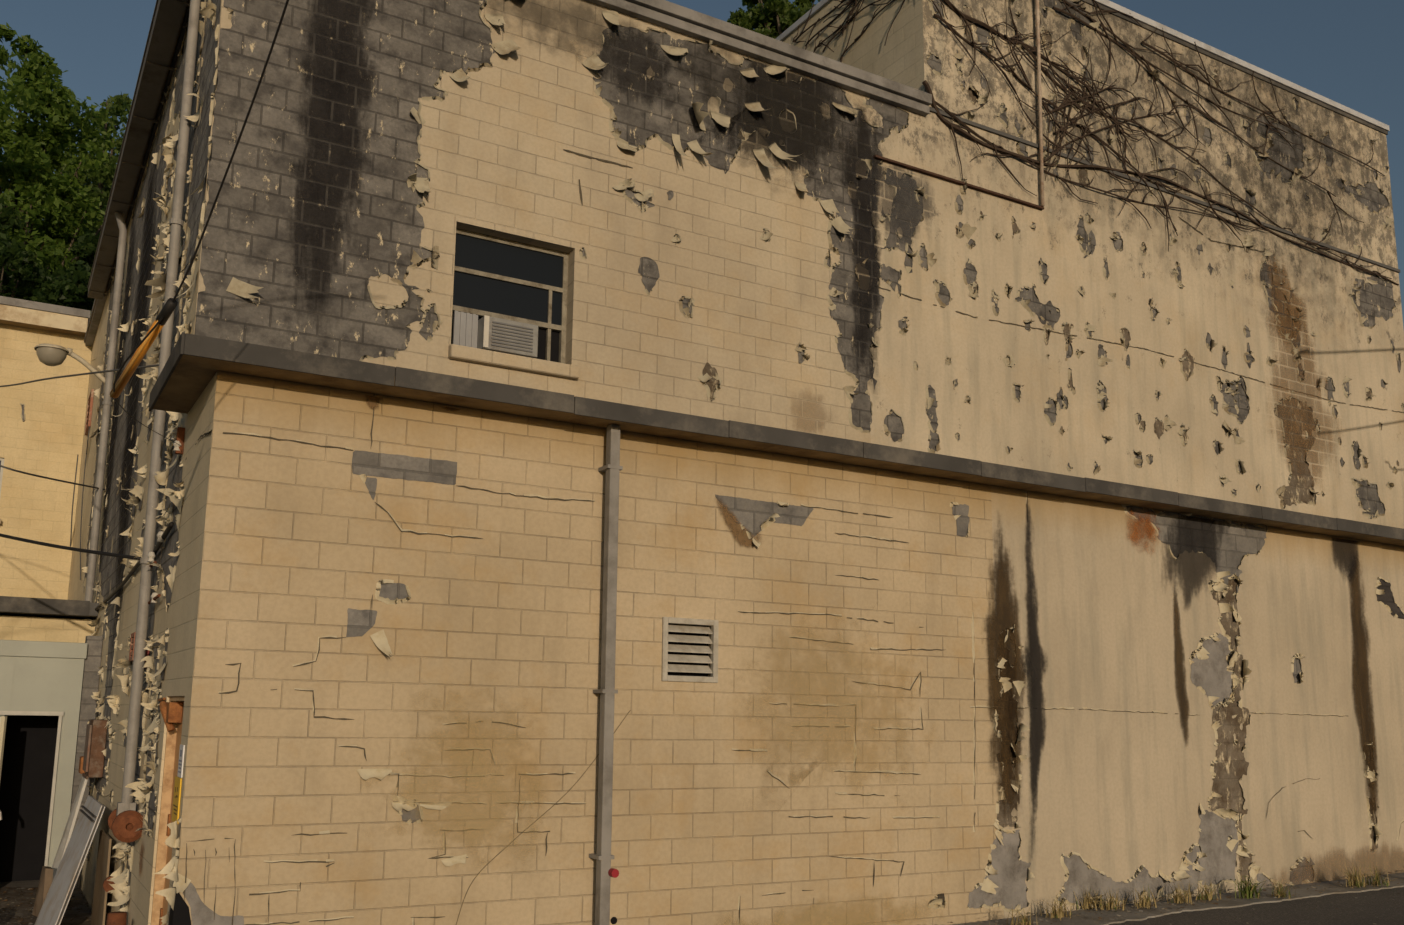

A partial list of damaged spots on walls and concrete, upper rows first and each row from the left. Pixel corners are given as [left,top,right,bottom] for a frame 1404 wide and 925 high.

leakage [101,196,151,549]
peeling [81,0,520,925]
leakage [307,75,356,147]
peeling [582,10,952,442]
peeling [954,178,1131,436]
peeling [1159,233,1403,519]
crack [219,663,241,694]
crack [184,830,354,925]
crack [272,636,586,859]
spalling [967,624,1034,913]
peeling [1053,504,1315,909]
leakage [1352,563,1377,810]